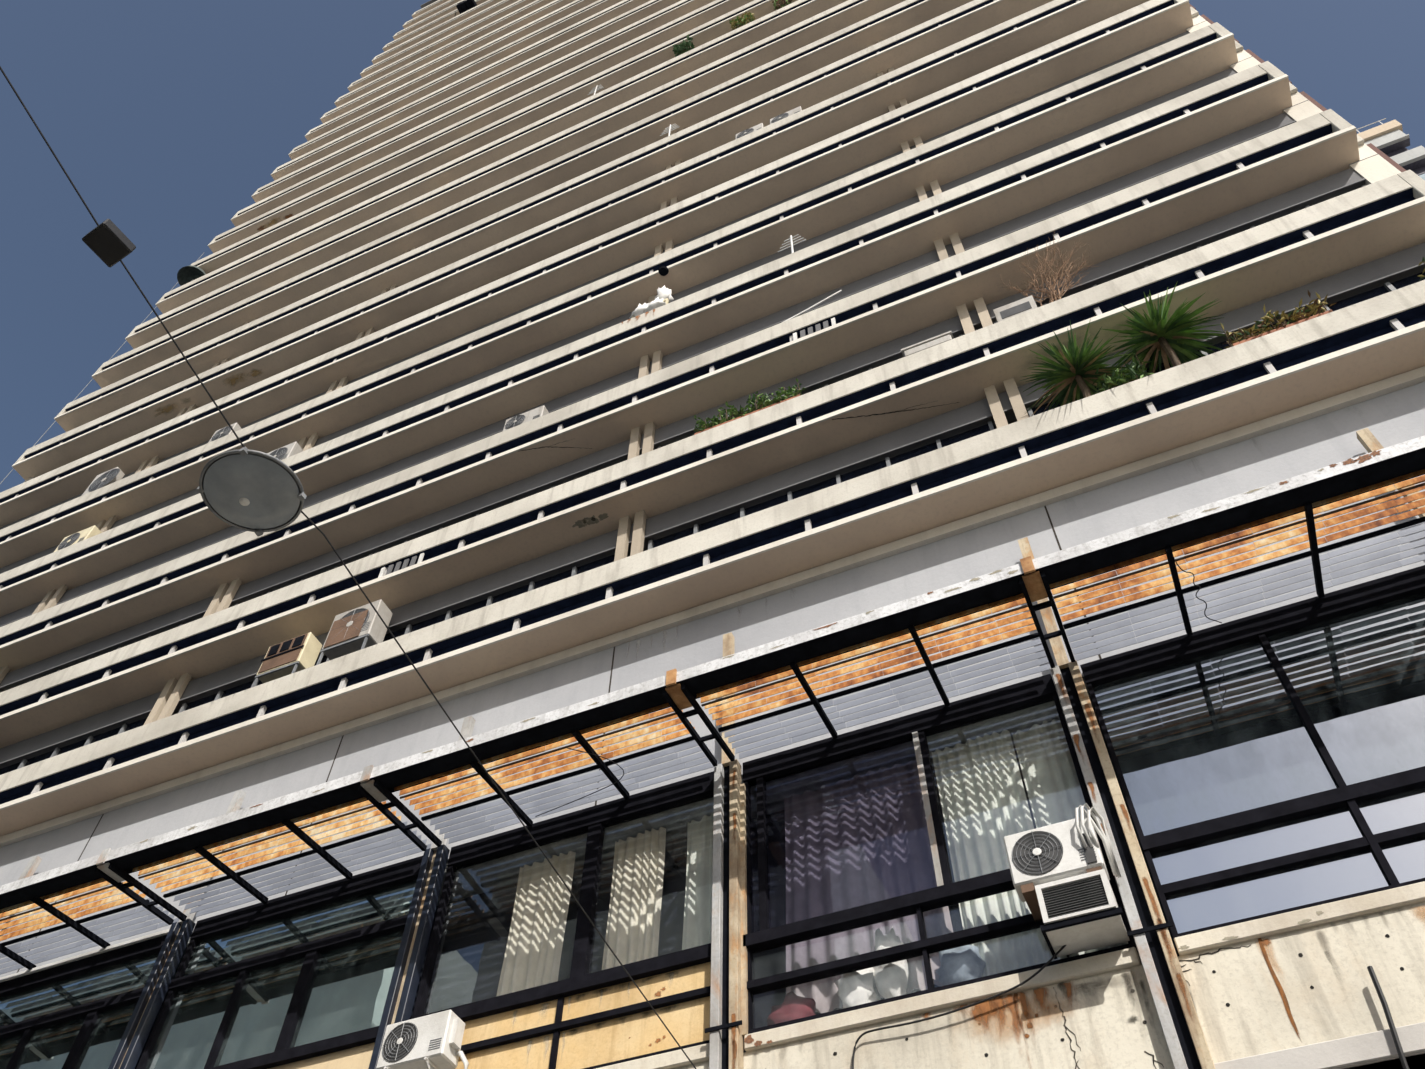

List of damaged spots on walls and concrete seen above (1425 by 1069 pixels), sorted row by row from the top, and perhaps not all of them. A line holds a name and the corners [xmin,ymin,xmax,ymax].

rust [960,982,1072,1038]
crack [1053,987,1081,1069]
rust [1258,938,1299,1037]